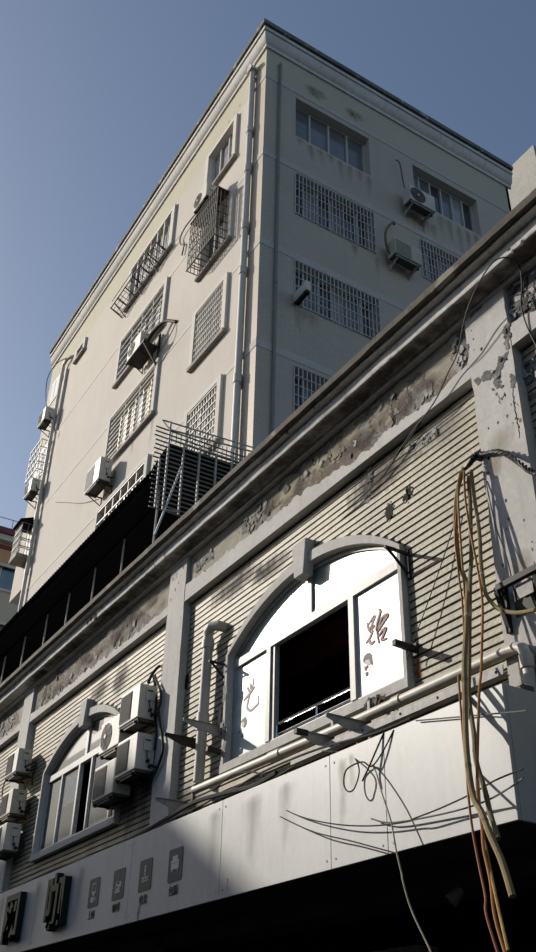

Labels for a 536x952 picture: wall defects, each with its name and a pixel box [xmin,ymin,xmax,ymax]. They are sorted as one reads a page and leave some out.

peeling [474,265,536,429]
peeling [240,330,482,535]
peeling [170,548,214,601]